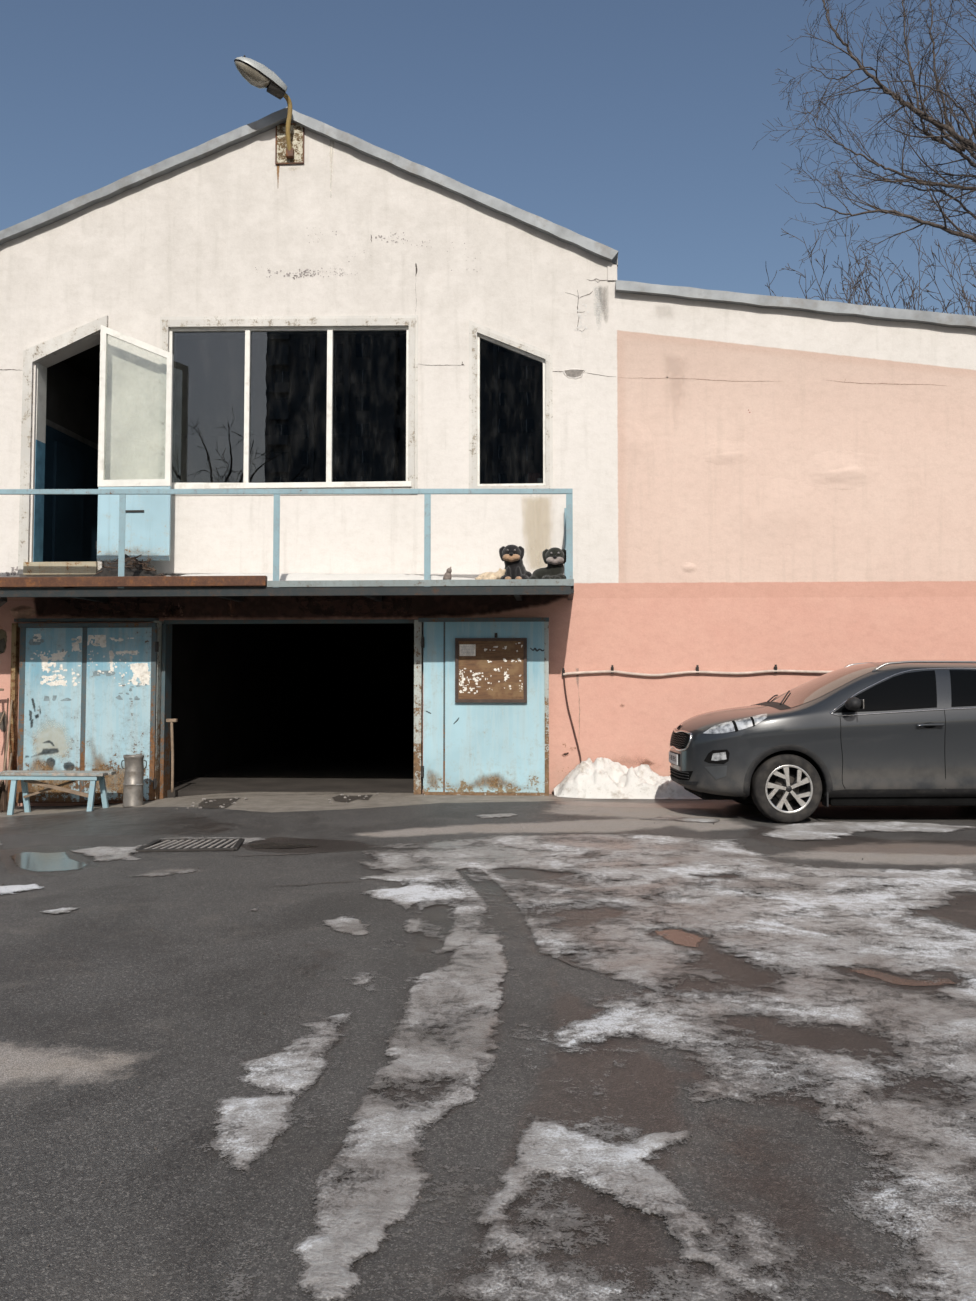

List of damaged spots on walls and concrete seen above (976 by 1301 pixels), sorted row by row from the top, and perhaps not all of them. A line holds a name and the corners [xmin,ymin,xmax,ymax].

corrosion [95,760,125,791]
corrosion [477,776,506,785]